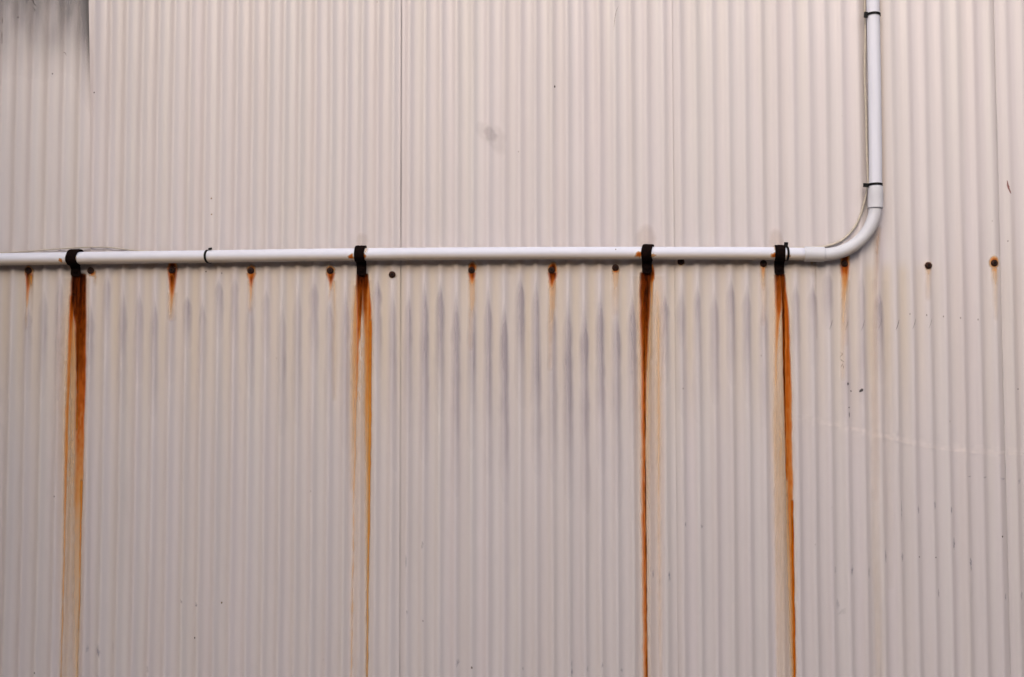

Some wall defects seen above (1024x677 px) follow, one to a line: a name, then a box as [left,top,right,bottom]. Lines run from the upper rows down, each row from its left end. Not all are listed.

corrosion [24,266,34,304]
corrosion [61,271,96,663]
corrosion [167,263,178,309]
corrosion [353,274,372,677]
corrosion [468,262,477,304]
corrosion [635,251,659,677]
corrosion [760,253,796,677]
corrosion [840,256,850,305]